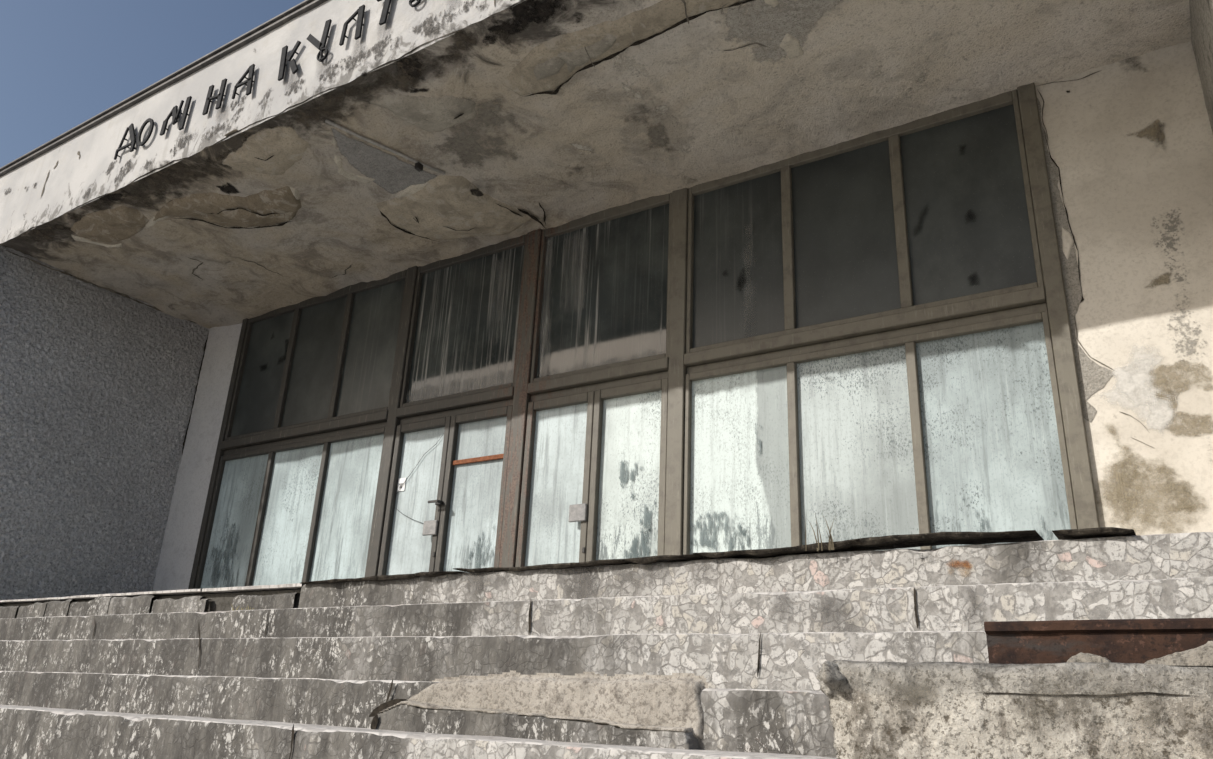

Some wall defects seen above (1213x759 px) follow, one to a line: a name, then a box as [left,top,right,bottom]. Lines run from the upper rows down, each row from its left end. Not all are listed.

leakage [285,0,580,129]
crack [523,0,754,97]
flaking render [332,129,437,194]
flaking render [1037,98,1115,422]
leakage [1103,346,1213,436]
leakage [1097,447,1199,532]